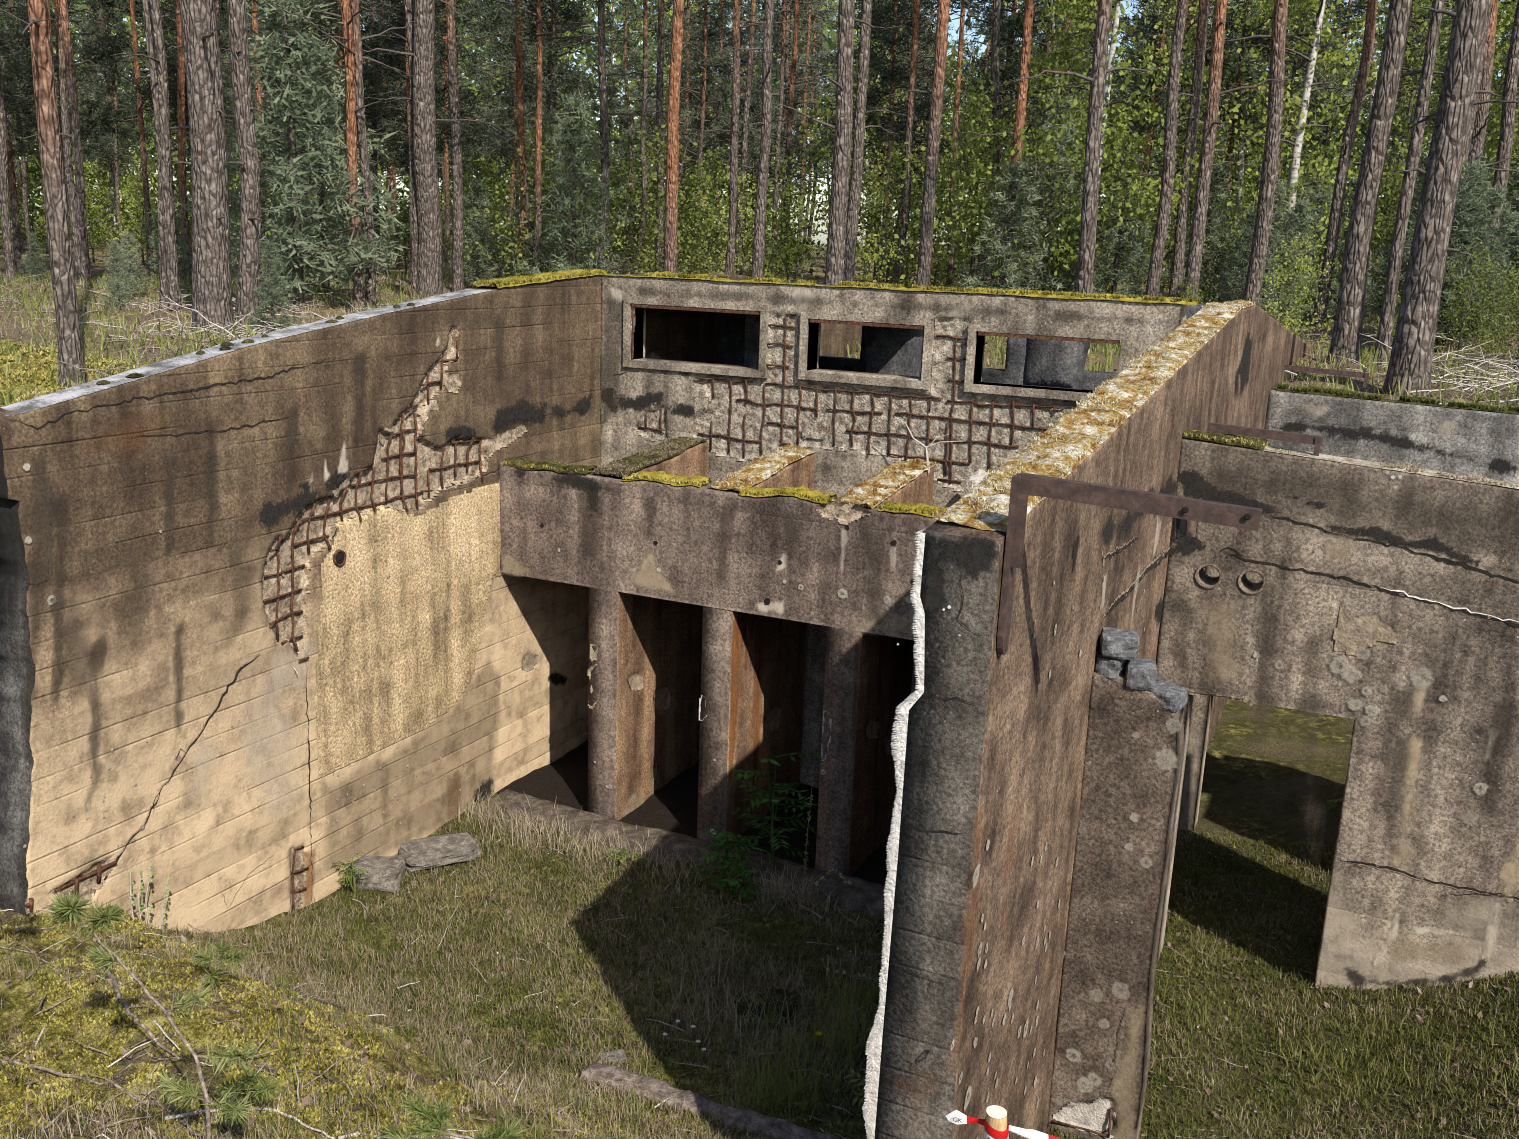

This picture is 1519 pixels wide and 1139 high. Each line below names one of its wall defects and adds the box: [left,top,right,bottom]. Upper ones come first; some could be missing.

crack [7,358,333,438]
spalling [693,313,1079,492]
peeling [262,327,528,777]
crack [1221,515,1519,627]
crack [88,653,261,900]
crack [1341,859,1519,903]